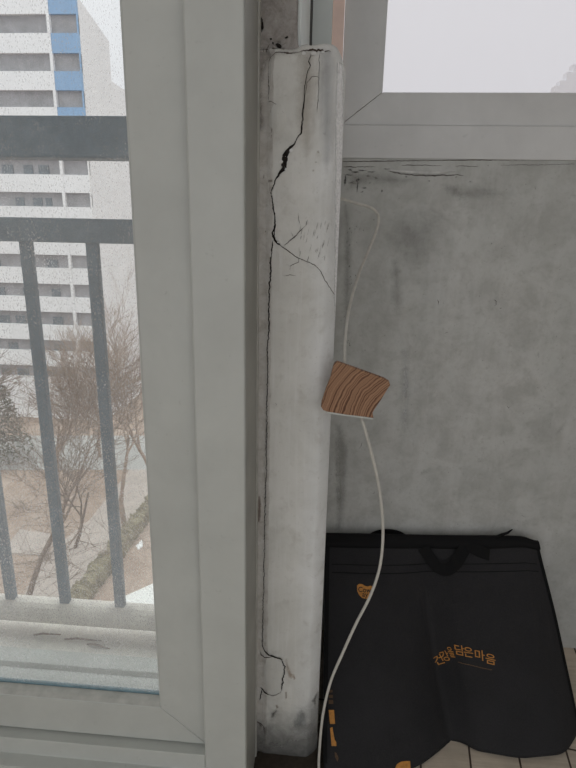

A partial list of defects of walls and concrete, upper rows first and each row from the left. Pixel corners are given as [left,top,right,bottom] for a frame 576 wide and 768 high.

crack [260,52,334,699]